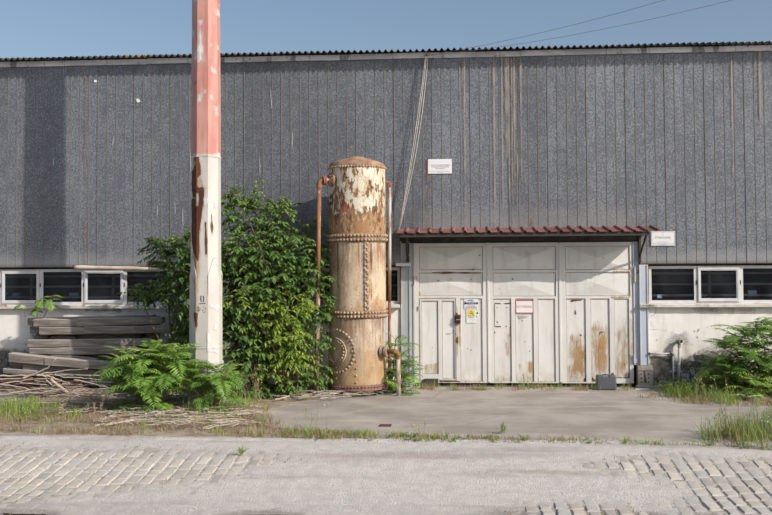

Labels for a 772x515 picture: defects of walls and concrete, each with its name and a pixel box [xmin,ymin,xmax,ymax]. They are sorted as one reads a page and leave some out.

peeling [193,21,203,61]
rust [191,157,213,328]
water stain [0,350,30,374]
rust [569,327,607,381]